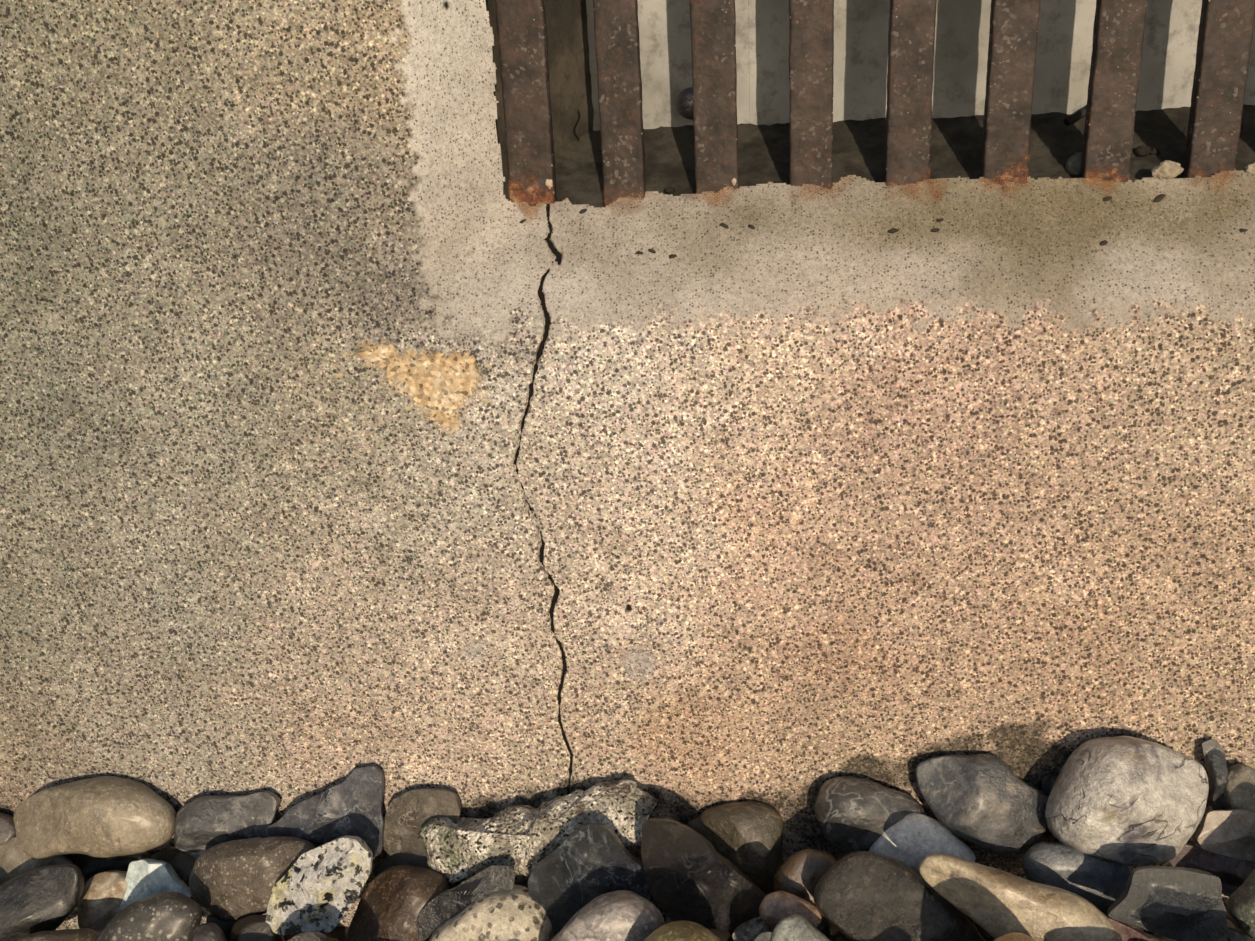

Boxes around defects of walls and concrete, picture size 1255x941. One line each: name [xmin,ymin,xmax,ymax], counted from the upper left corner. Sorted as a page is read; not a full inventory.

corrosion [510,177,554,214]
spalling [341,341,492,436]
crack [513,204,573,794]